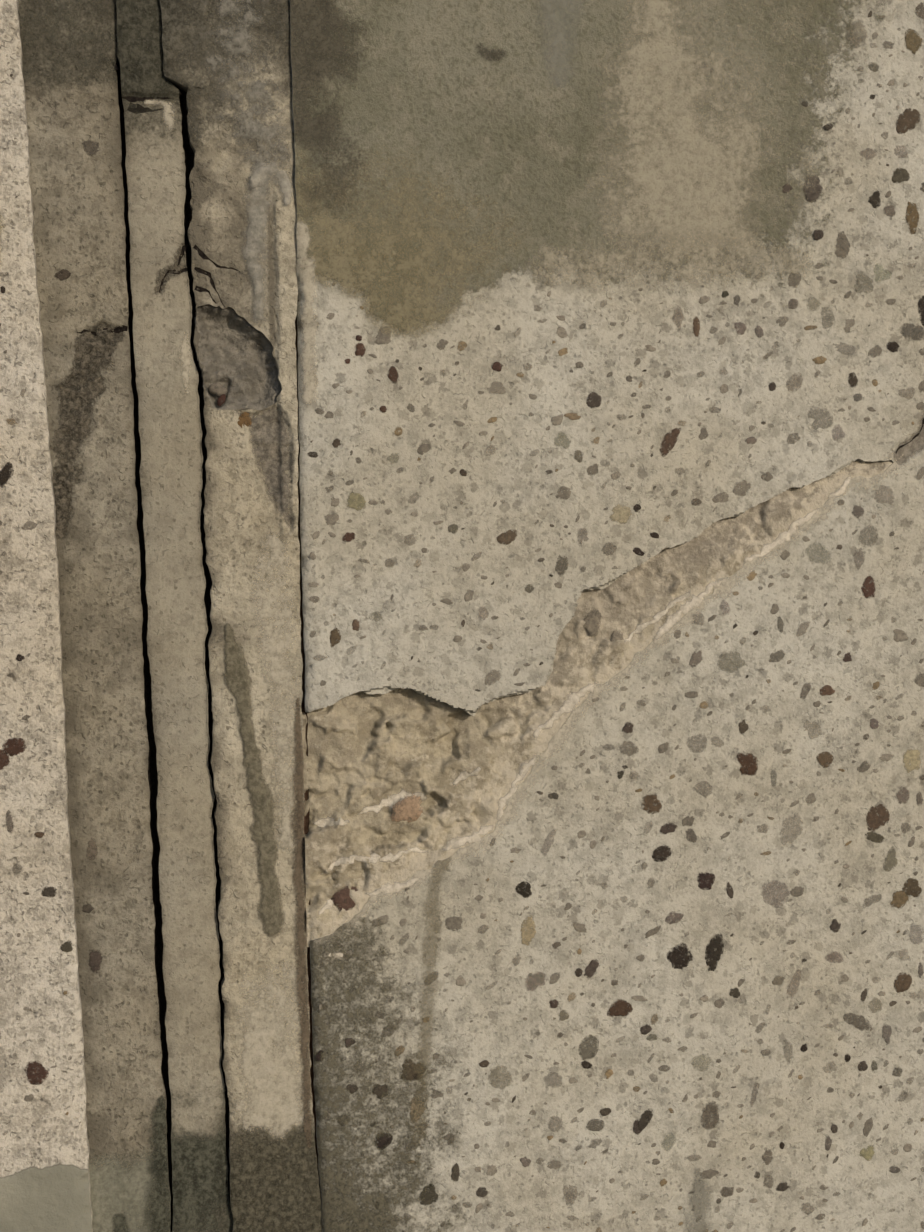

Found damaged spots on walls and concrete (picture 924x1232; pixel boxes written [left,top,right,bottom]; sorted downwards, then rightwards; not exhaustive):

leakage [478,43,505,60]
leakage [534,0,811,287]
crack [894,411,924,464]
crack [77,60,240,1232]
spalling [179,305,906,963]
leakage [89,919,460,1232]